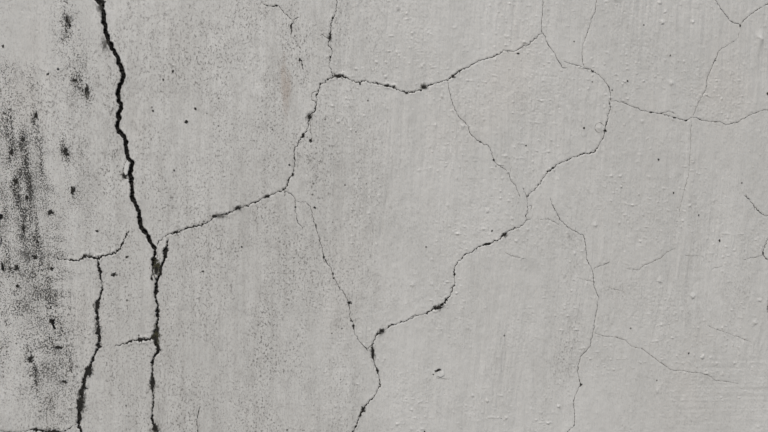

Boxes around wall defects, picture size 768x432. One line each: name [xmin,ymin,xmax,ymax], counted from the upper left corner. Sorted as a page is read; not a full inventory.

crack [703,3,768,94]
crack [95,0,701,432]
crack [0,231,129,432]
crack [567,305,739,432]